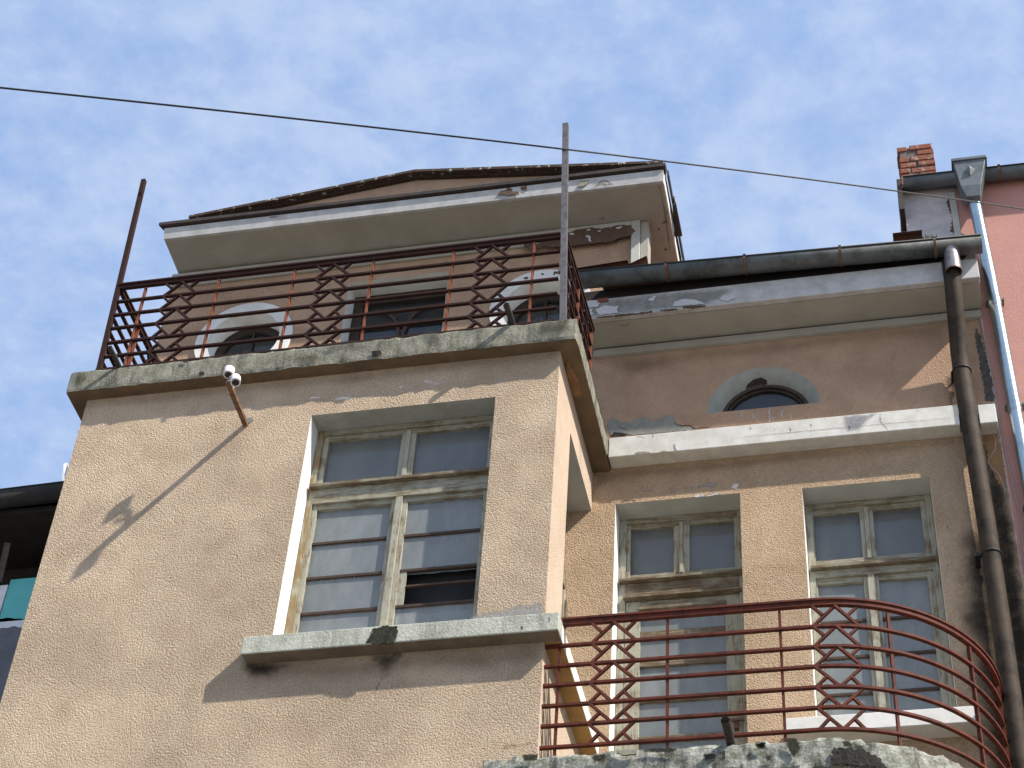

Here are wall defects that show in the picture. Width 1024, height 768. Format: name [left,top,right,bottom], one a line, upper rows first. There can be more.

peeling [568,225,635,246]
peeling [607,415,710,455]
water stain [967,534,1007,768]
water stain [986,451,1024,708]